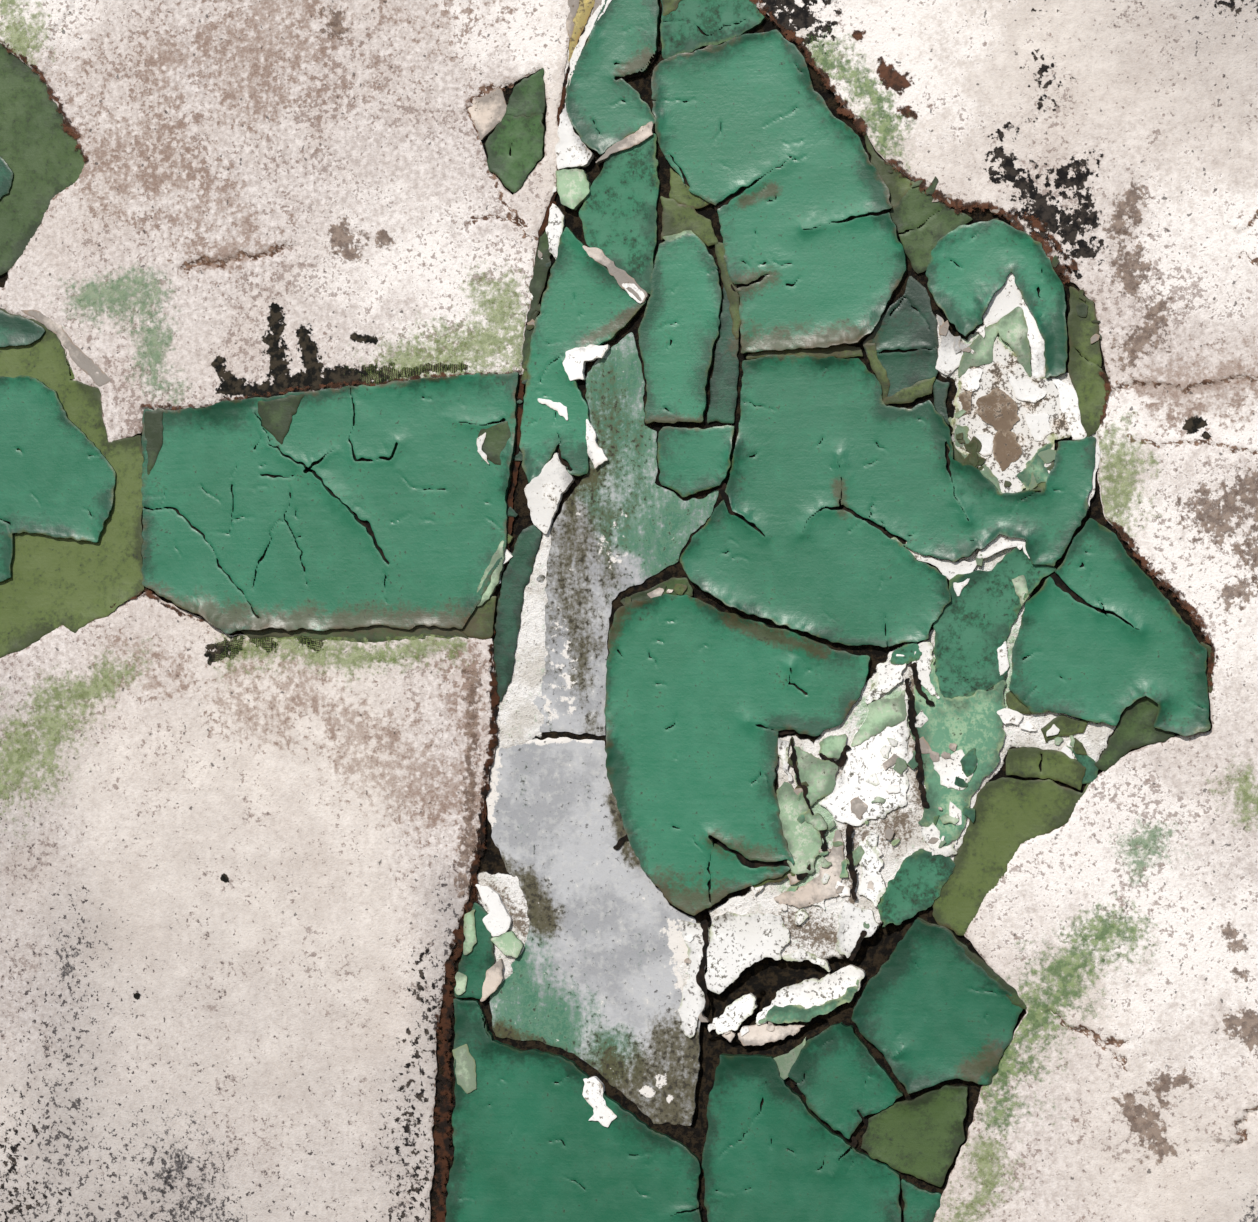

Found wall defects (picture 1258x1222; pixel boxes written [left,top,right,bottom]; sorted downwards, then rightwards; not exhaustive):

crack [557,30,585,126]
water stain [761,0,843,59]
water stain [877,56,918,120]
peeling [0,43,85,276]
crack [1238,209,1258,265]
water stain [211,298,468,400]
crack [1110,376,1258,394]
peeling [0,308,523,658]
crack [1126,434,1258,455]
crack [492,374,524,726]
water stain [1168,459,1258,611]
peeling [445,0,1215,1222]